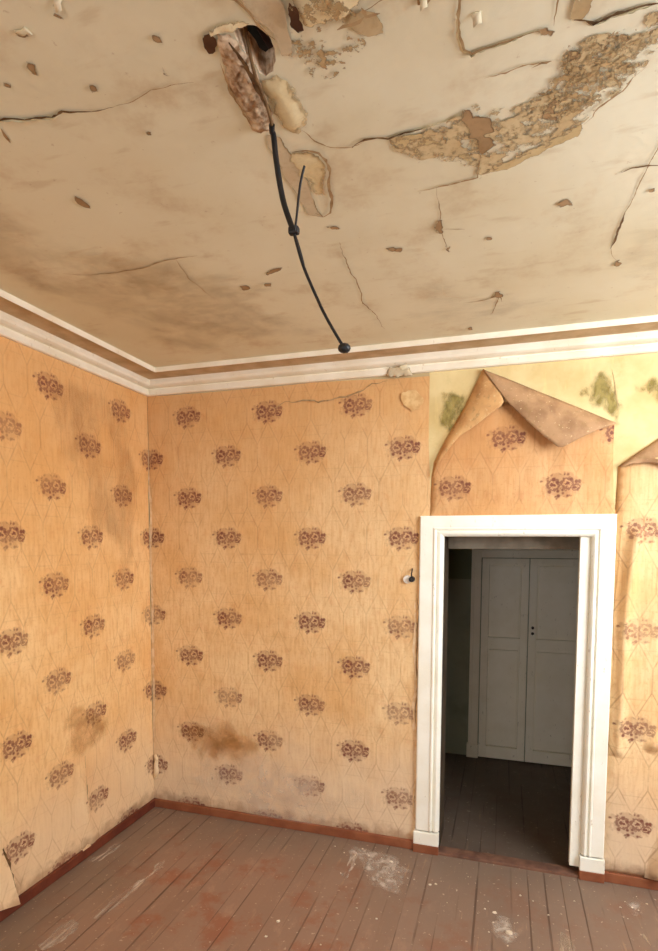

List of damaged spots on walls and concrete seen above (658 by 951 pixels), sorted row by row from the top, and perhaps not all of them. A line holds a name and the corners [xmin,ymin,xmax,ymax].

crack [0,82,193,142]
peeling [203,0,658,230]
crack [610,148,658,266]
leakage [441,394,464,430]
peeling [429,353,658,508]
leakage [585,373,617,414]